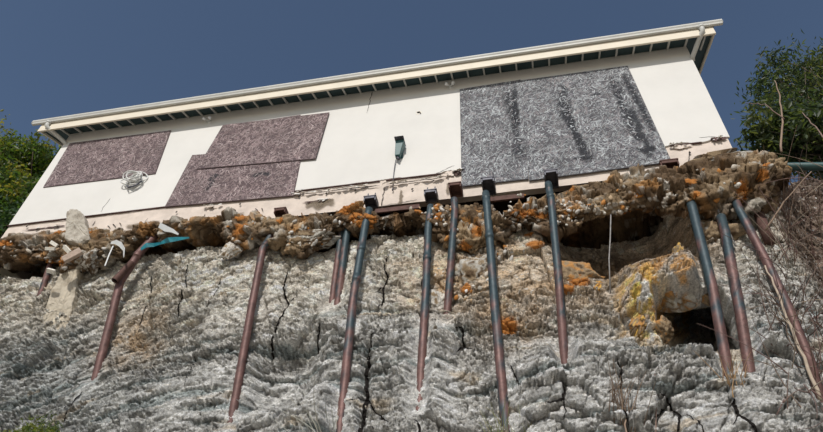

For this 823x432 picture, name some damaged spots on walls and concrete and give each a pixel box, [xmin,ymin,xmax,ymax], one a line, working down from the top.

flaking render [294,184,368,203]
spalling [382,168,464,184]
rust [337,203,377,228]
crack [177,265,191,321]
rust [564,274,589,295]
crack [271,272,298,364]
crack [345,255,389,432]
crack [455,326,476,352]
rust [491,317,517,335]
crack [547,382,569,418]
crack [608,359,629,428]
crack [651,392,704,432]